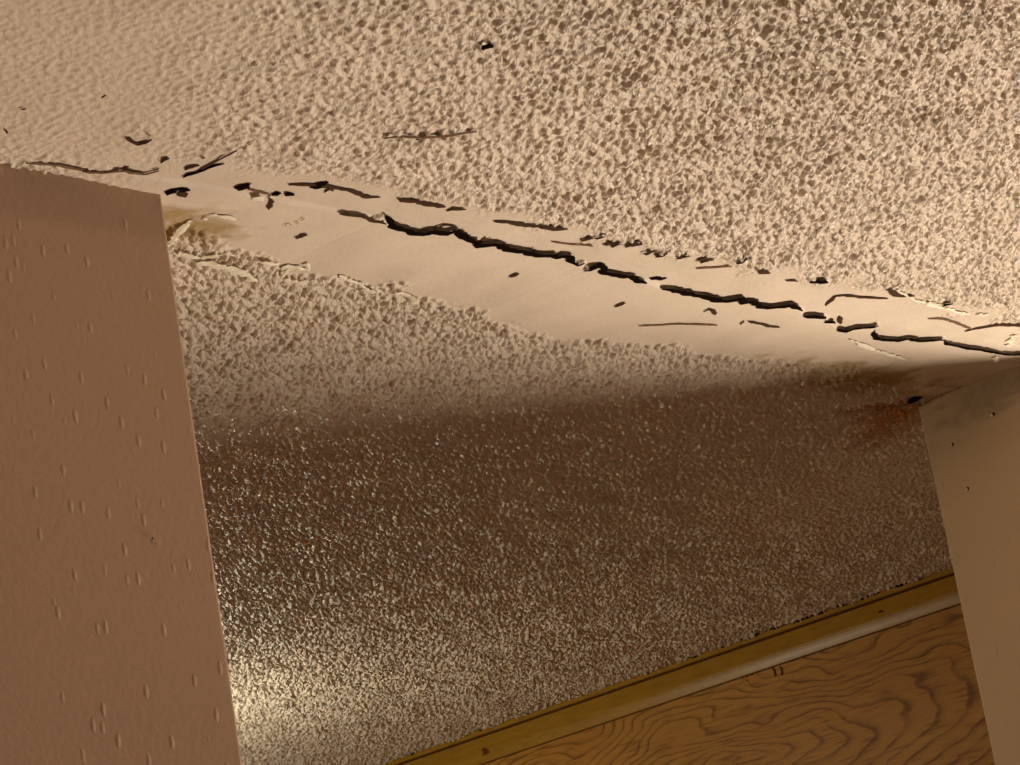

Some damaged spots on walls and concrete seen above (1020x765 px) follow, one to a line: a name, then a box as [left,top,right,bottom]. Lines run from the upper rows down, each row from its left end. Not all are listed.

crack [26,133,237,198]
flaking render [234,183,278,202]
peeling [167,214,258,282]
spalling [581,236,715,264]
peeling [261,261,311,285]
crack [247,183,1020,356]
peeling [896,290,989,317]
peeling [850,340,905,360]